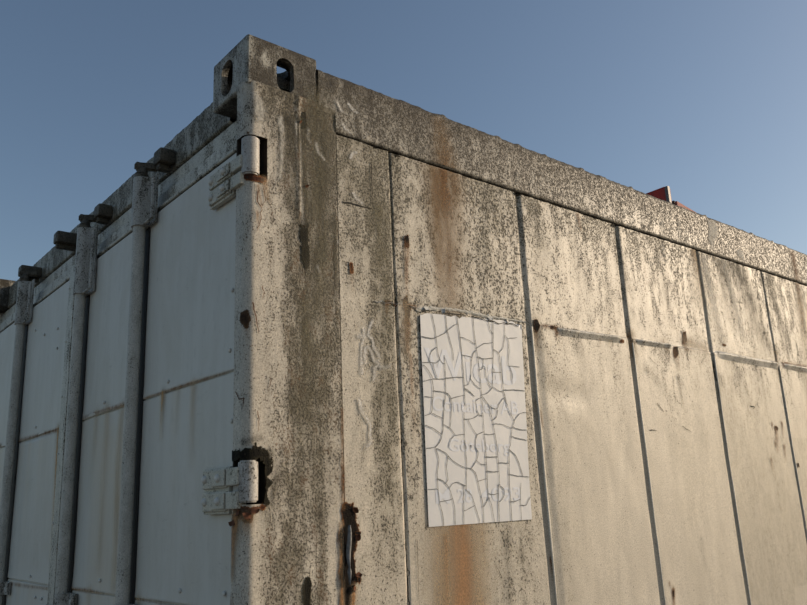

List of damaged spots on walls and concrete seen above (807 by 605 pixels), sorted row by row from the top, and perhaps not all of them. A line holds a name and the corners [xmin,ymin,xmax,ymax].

water stain [702,220,767,335]
corrosion [240,309,251,329]
crack [357,300,530,526]
corrosion [228,504,266,570]
corrosion [436,524,484,605]